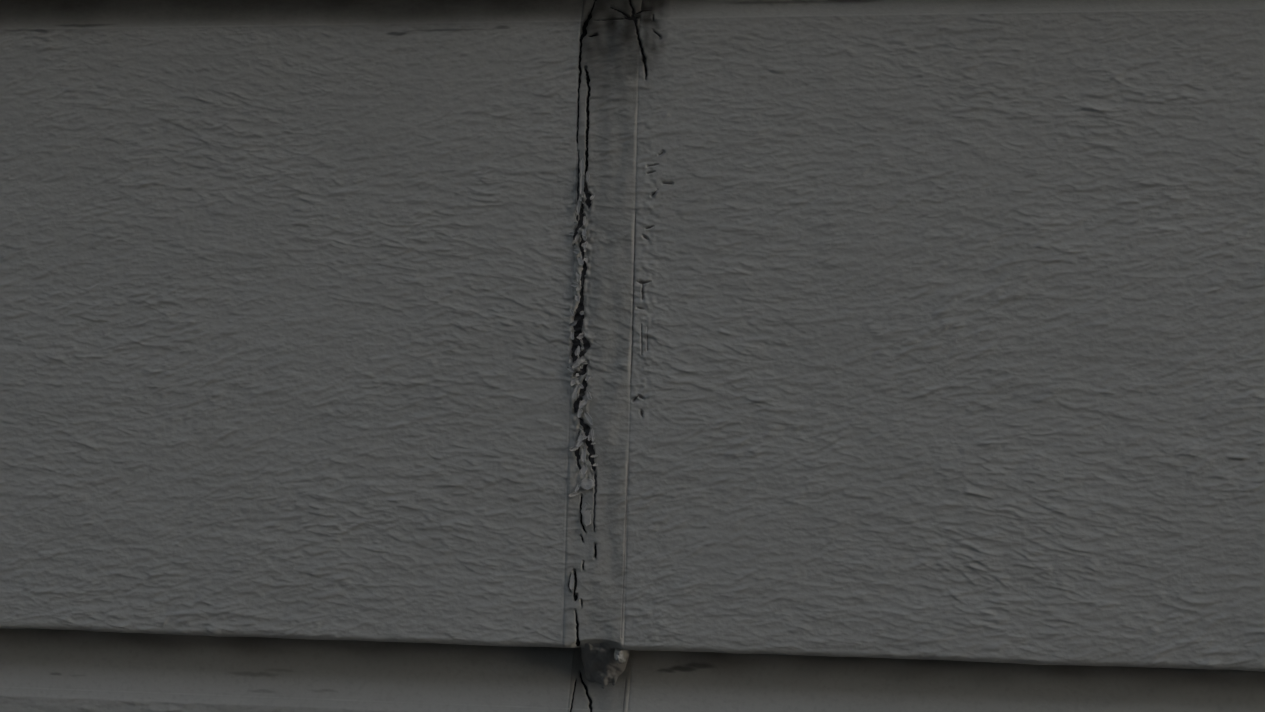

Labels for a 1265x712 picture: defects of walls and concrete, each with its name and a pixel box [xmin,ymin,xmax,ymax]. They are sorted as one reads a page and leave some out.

crack [567,0,661,712]